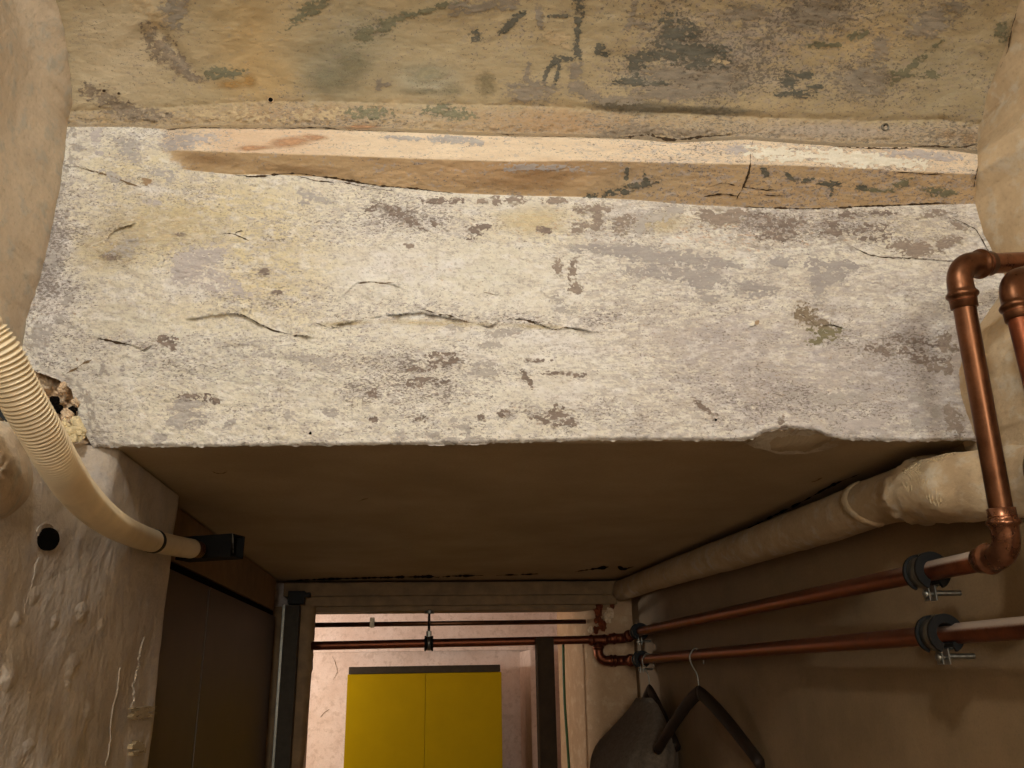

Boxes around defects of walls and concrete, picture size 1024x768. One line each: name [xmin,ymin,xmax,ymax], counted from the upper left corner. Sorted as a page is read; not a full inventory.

leakage [600,102,745,115]
crack [704,142,989,251]
crack [855,248,950,262]
crack [230,313,329,337]
crack [484,292,576,330]
spalling [34,371,82,426]